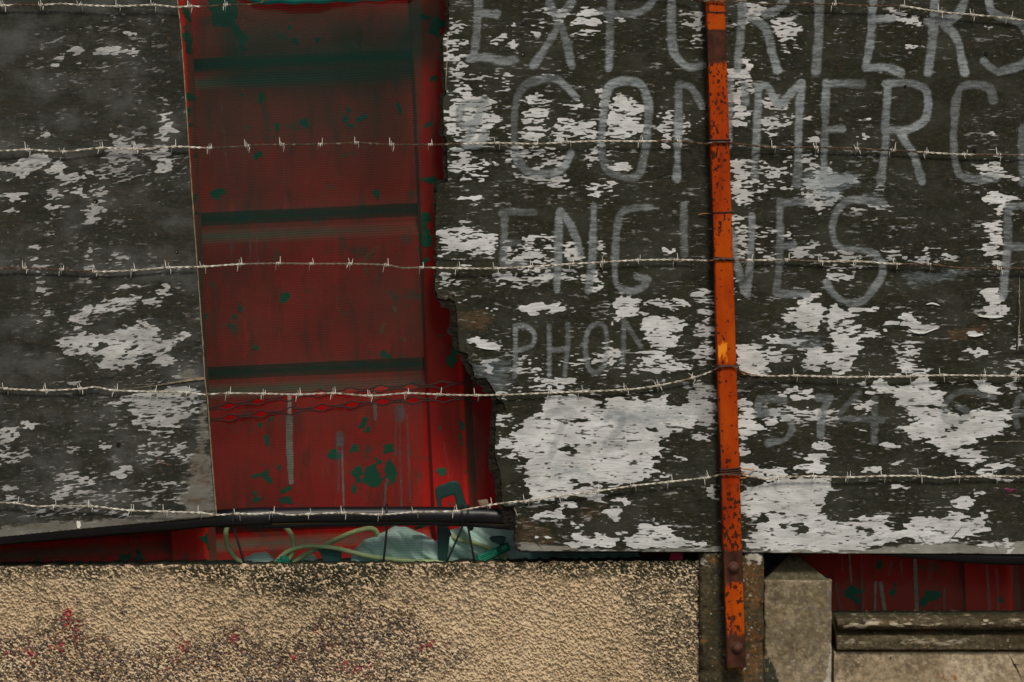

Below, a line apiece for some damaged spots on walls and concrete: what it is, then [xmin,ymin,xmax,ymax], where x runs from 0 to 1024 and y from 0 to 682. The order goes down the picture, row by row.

peeling [51,31,139,67]
peeling [0,93,196,225]
peeling [419,211,604,292]
peeling [421,10,708,198]
peeling [531,6,626,37]
peeling [731,2,803,54]
peeling [727,54,812,137]
peeling [730,136,958,281]
peeling [975,156,1024,266]
peeling [28,283,204,517]
peeling [467,288,717,565]
peeling [736,288,1024,565]